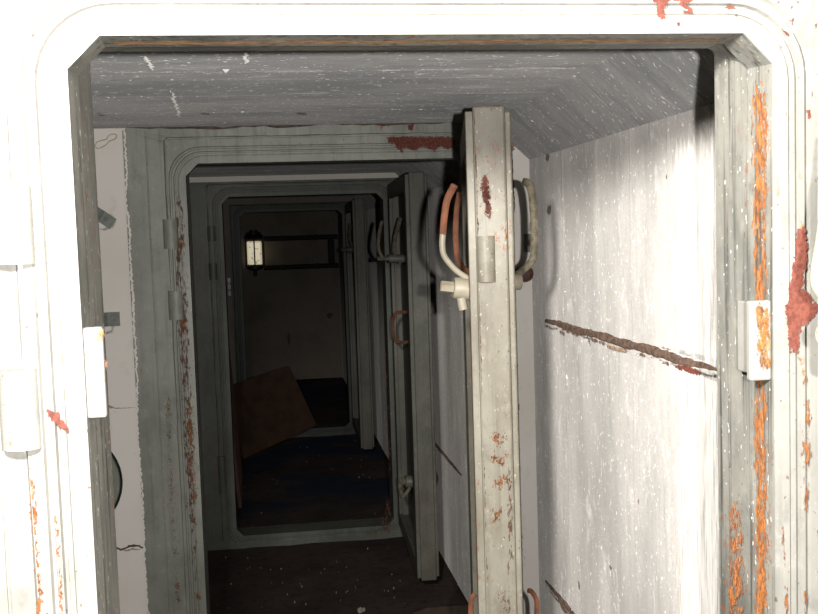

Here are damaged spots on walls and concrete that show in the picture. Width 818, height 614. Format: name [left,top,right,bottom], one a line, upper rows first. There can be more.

rust [387,124,455,153]
rust [475,146,492,233]
rust [751,81,772,369]
rust [175,196,197,533]
rust [785,224,818,384]
rust [29,468,43,614]
crack [117,543,143,551]
rust [728,501,744,614]
rust [751,381,770,614]
rust [801,442,812,467]